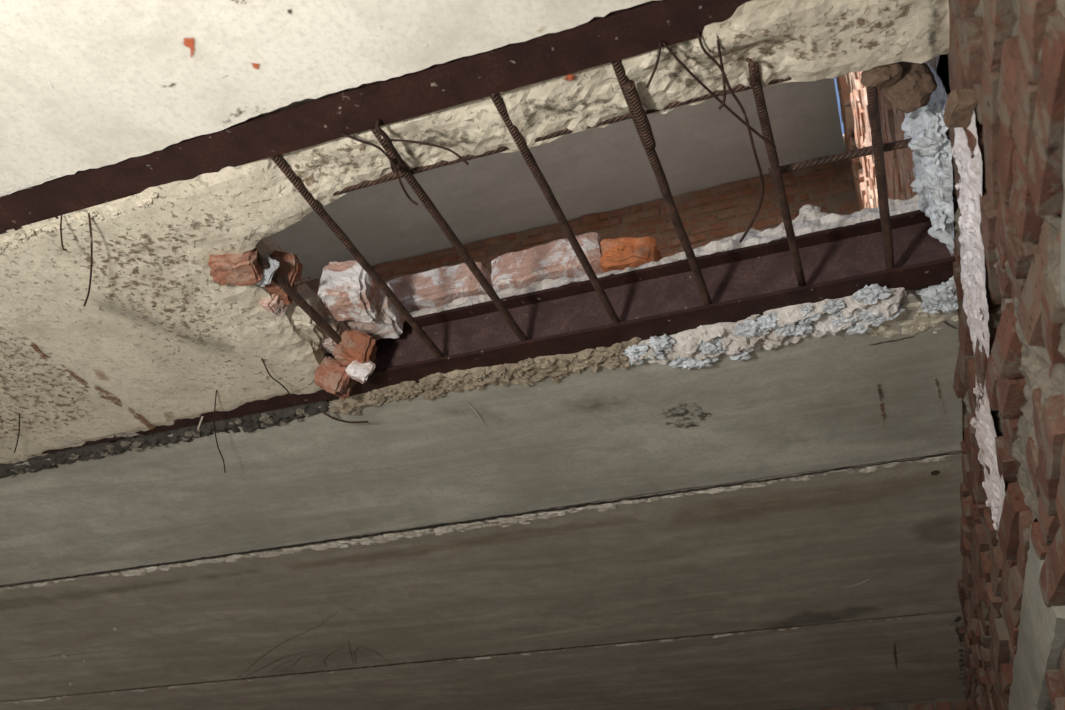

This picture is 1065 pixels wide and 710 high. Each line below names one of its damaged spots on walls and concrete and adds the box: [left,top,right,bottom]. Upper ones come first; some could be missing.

rust [184,38,194,57]
spalling [0,192,159,255]
peeling [868,302,959,338]
spalling [0,248,641,479]
rust [62,365,155,430]
damp [664,405,710,428]
crack [0,452,962,588]
crack [4,611,958,702]